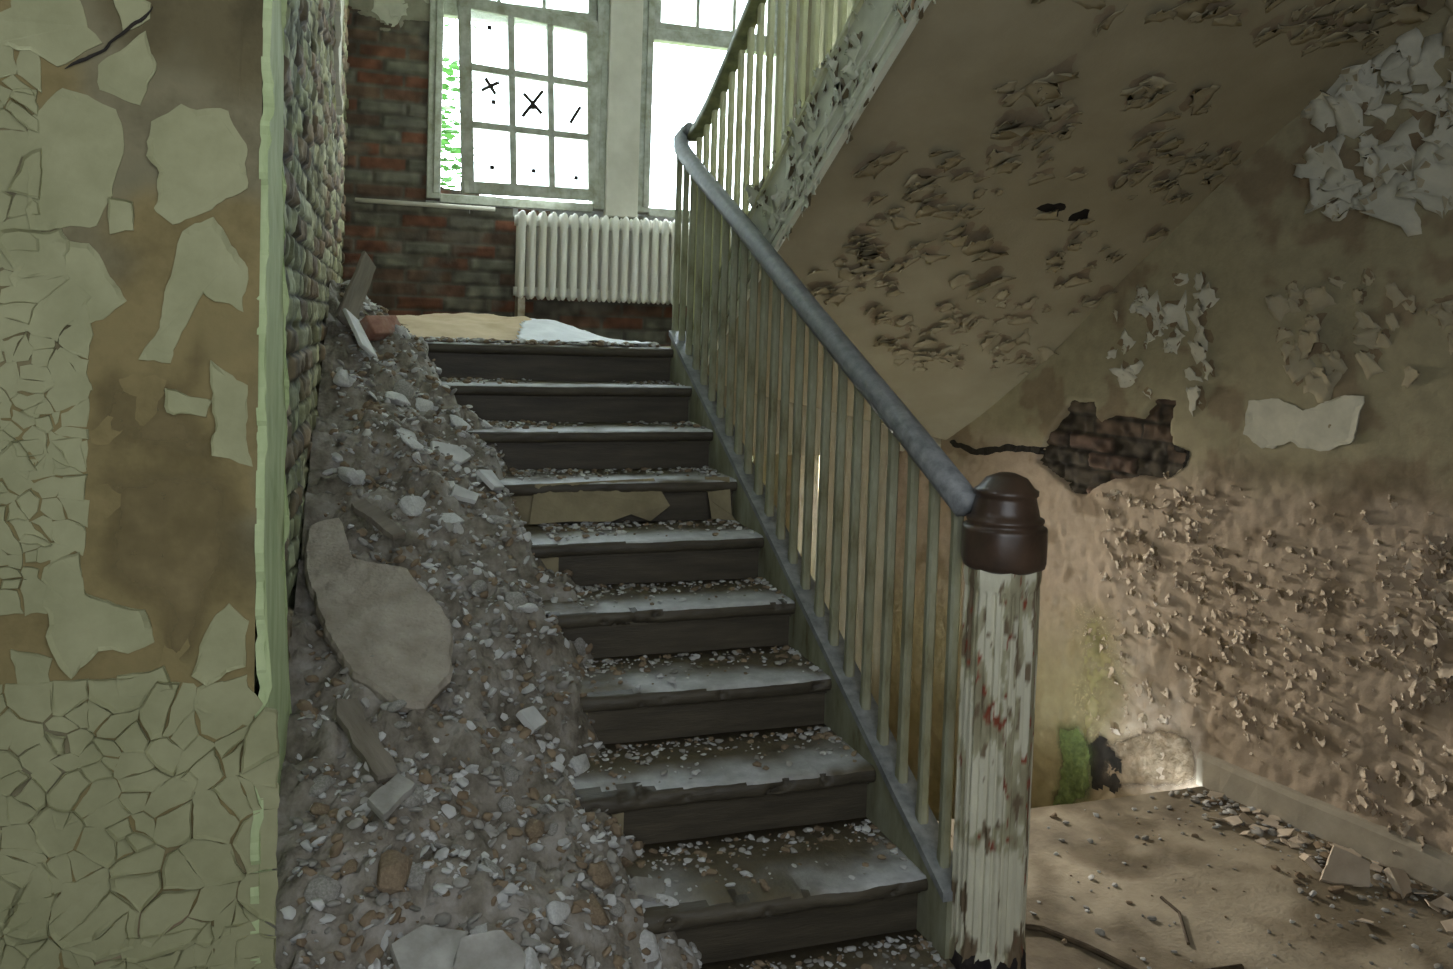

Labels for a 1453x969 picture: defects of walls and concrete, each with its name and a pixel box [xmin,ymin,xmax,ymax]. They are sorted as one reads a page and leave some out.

flaking render [0,0,687,969]
peeling [745,0,936,247]
peeling [807,53,1453,853]
peeling [1144,0,1453,237]